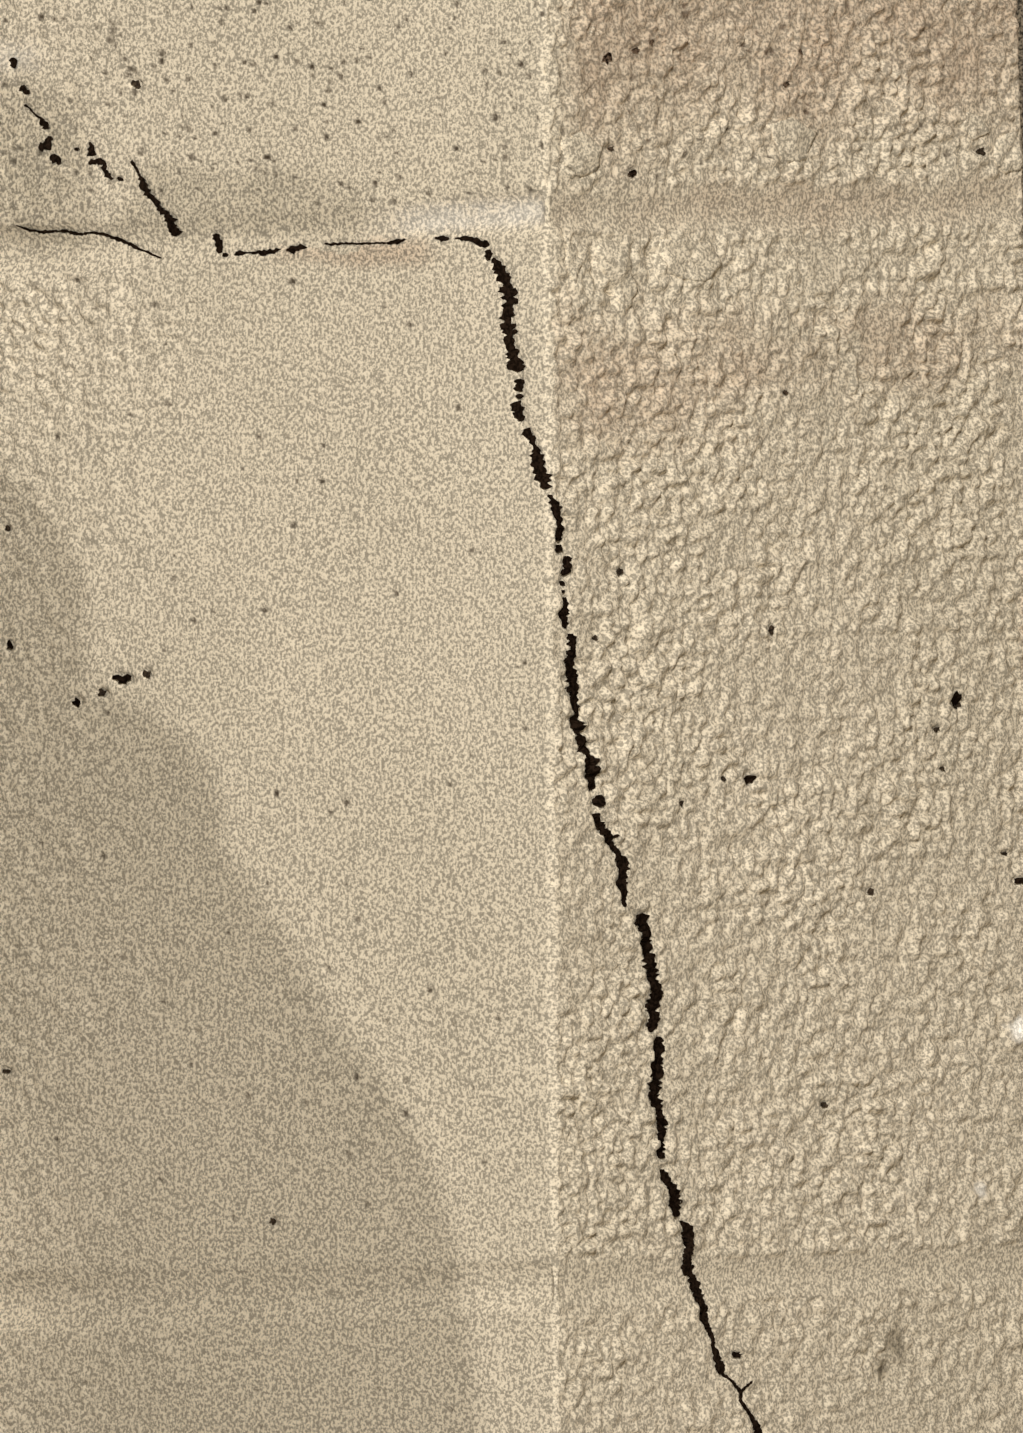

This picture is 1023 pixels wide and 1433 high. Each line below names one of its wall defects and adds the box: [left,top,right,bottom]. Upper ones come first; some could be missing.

crack [9,57,762,1433]